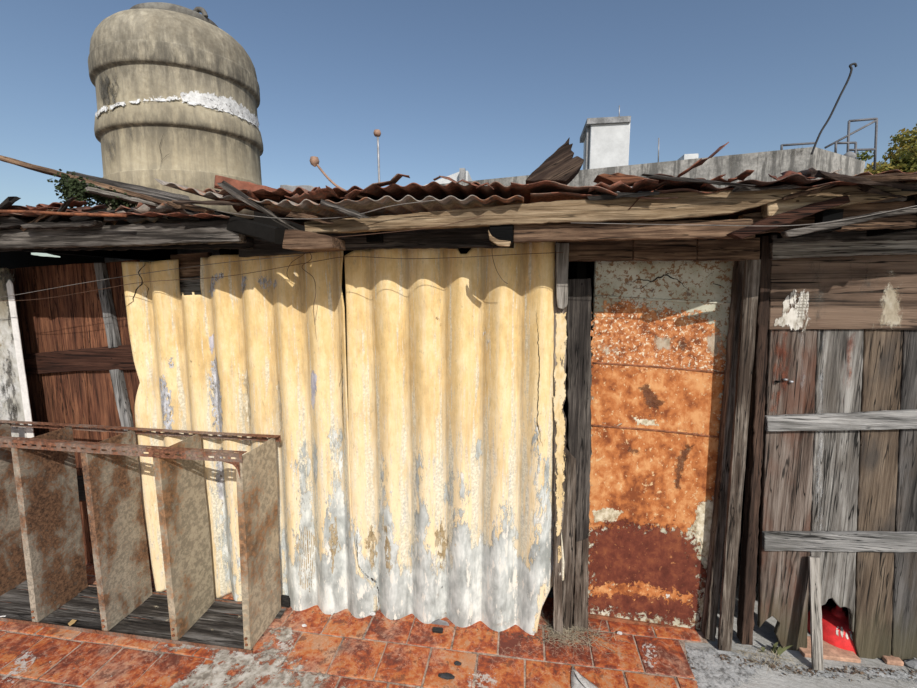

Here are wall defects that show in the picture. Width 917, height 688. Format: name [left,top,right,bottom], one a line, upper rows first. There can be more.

spalling [95,90,260,129]
peeling [774,289,810,331]
peeling [881,288,901,325]
peeling [278,312,567,635]
corrosion [588,297,726,629]